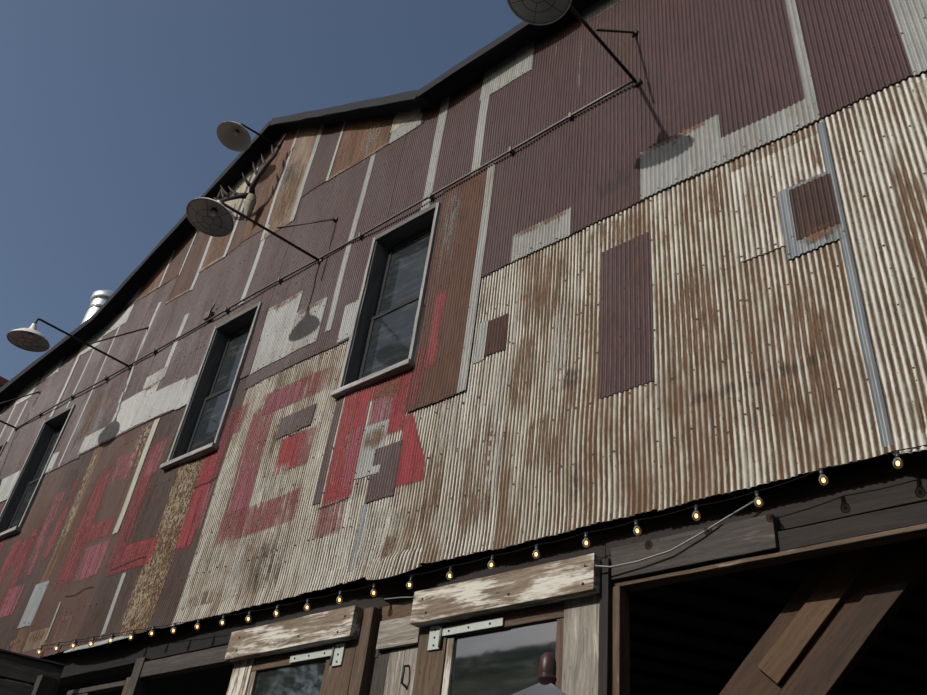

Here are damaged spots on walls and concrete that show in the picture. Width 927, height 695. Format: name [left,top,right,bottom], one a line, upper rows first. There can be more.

corrosion [701,172,727,221]
corrosion [890,152,927,278]
corrosion [511,260,562,409]
corrosion [526,371,577,466]
corrosion [666,269,726,381]
corrosion [693,289,848,441]
corrosion [183,590,214,610]